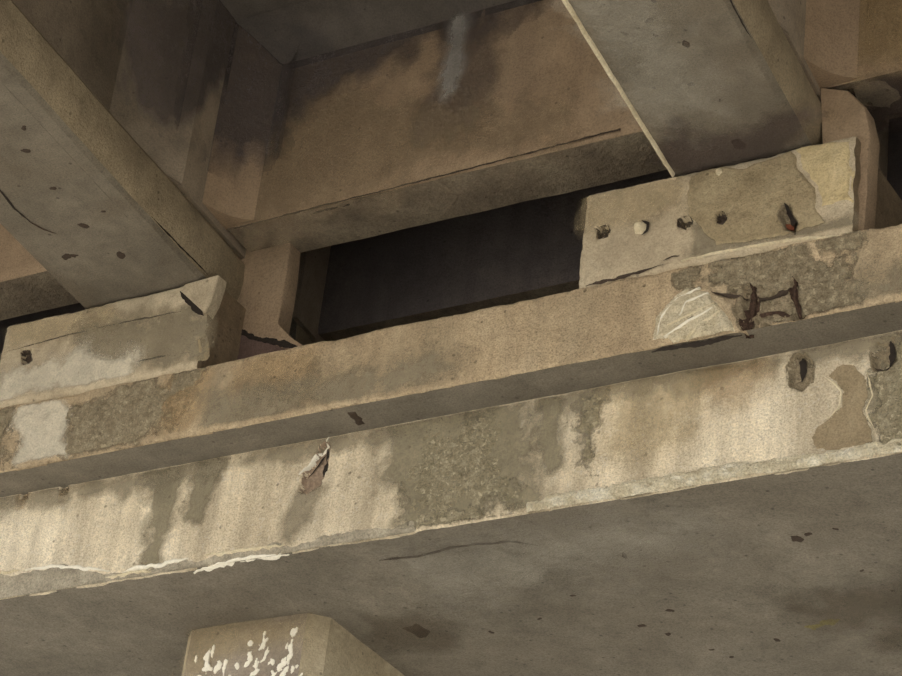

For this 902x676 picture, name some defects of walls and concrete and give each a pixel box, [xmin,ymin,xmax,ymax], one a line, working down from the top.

crack [730,0,751,37]
leakage [416,12,493,139]
crack [0,190,56,234]
spalling [777,203,798,234]
spalling [653,229,869,343]
crack [4,291,204,353]
crack [241,329,298,348]
peeling [785,332,902,450]
spalling [0,407,524,599]